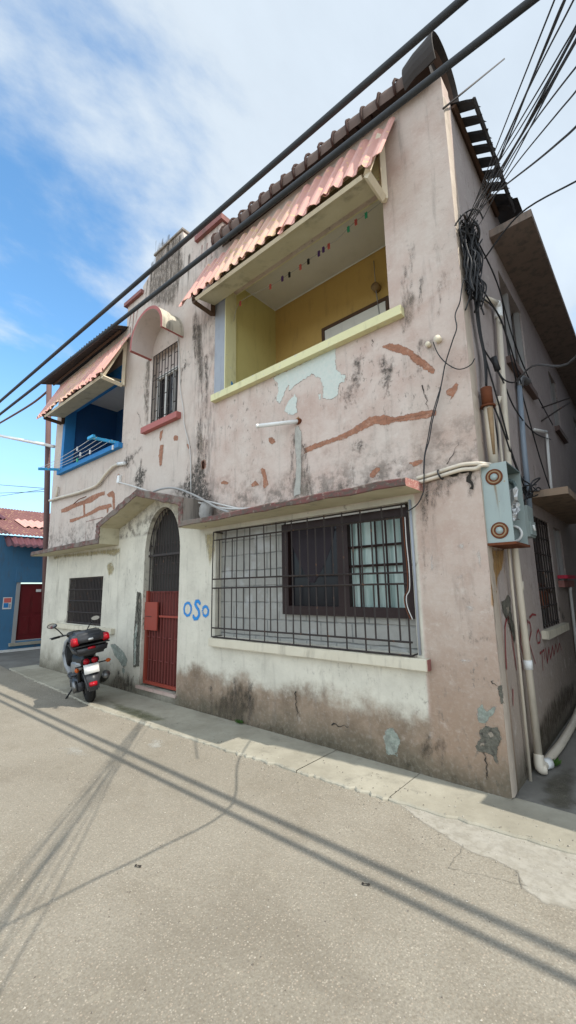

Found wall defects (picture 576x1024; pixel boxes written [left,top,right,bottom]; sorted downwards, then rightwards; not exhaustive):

water stain [184,315,207,401]
peeling [273,348,346,415]
water stain [178,424,211,501]
water stain [219,684,254,718]
peeling [383,728,400,757]
spalling [475,685,504,764]